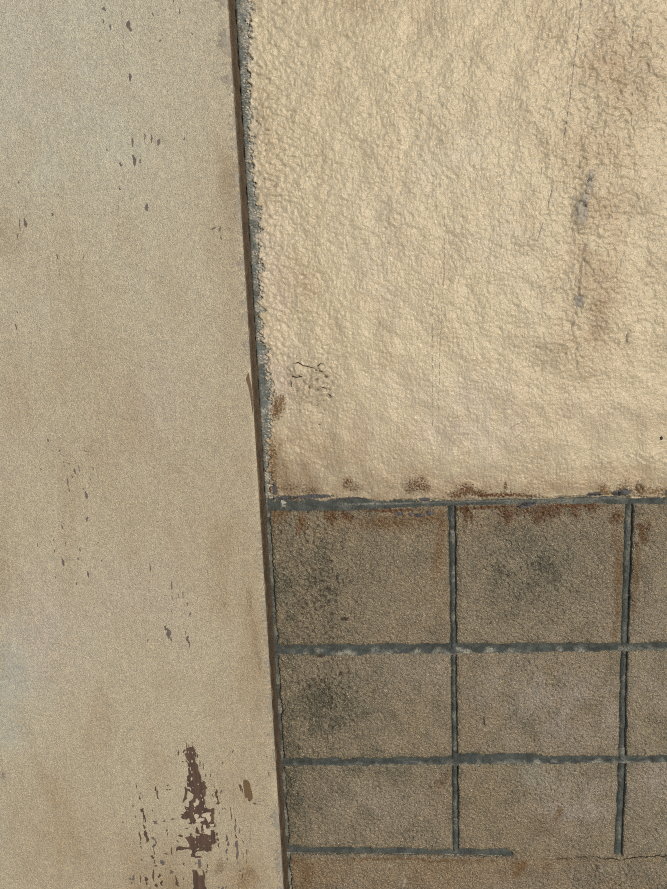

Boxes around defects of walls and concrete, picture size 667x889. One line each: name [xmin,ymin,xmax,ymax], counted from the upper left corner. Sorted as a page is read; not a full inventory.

corrosion [446,482,607,526]
corrosion [598,483,666,497]
peeling [129,743,247,889]